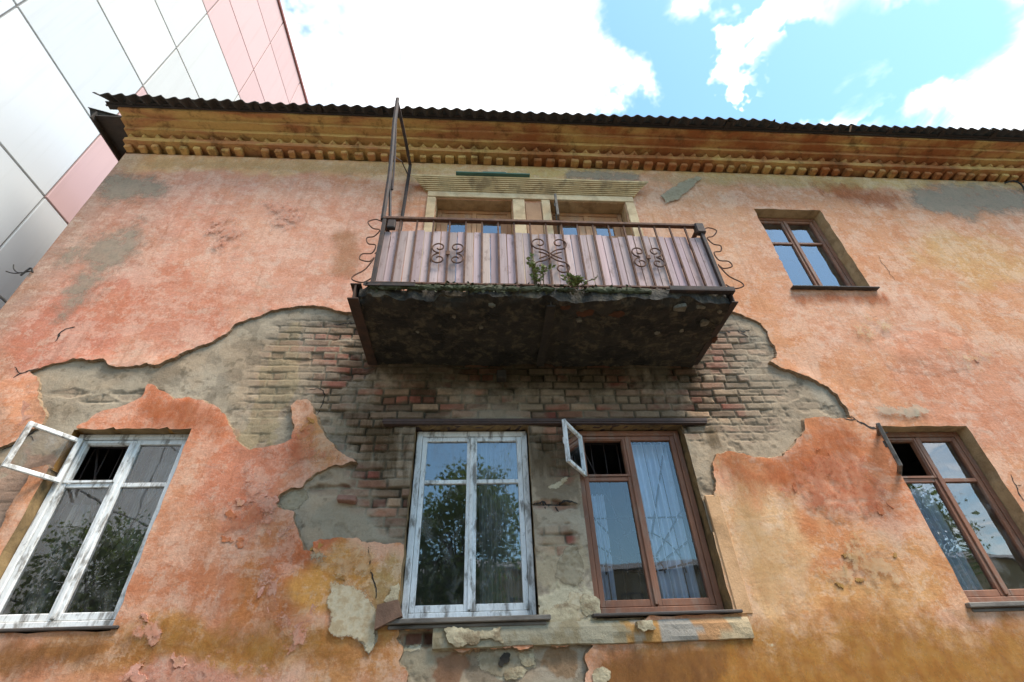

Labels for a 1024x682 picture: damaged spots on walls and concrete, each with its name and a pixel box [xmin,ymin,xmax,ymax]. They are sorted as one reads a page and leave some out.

leakage [102,174,167,199]
leakage [912,183,1024,222]
flaking render [0,303,852,655]
peeling [815,532,901,590]
peeling [119,651,272,682]
flaking render [396,626,611,682]